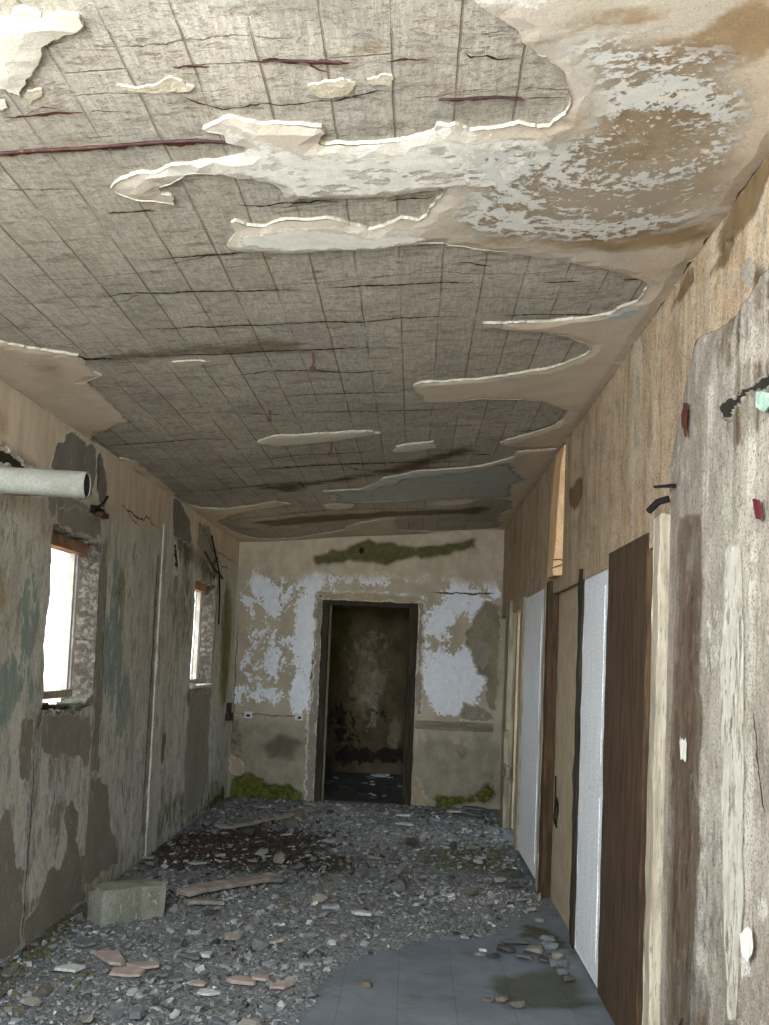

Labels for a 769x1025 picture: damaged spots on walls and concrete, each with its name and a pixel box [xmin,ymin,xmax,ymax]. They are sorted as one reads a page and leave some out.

crack [172,63,211,71]
crack [244,58,352,73]
crack [383,56,428,64]
crack [181,90,397,110]
crack [447,95,565,103]
crack [7,107,126,118]
crack [0,142,219,157]
spalling [0,0,755,576]
spalling [718,373,769,423]
mould [315,539,474,565]
spalling [458,600,502,723]
peeling [303,590,426,801]